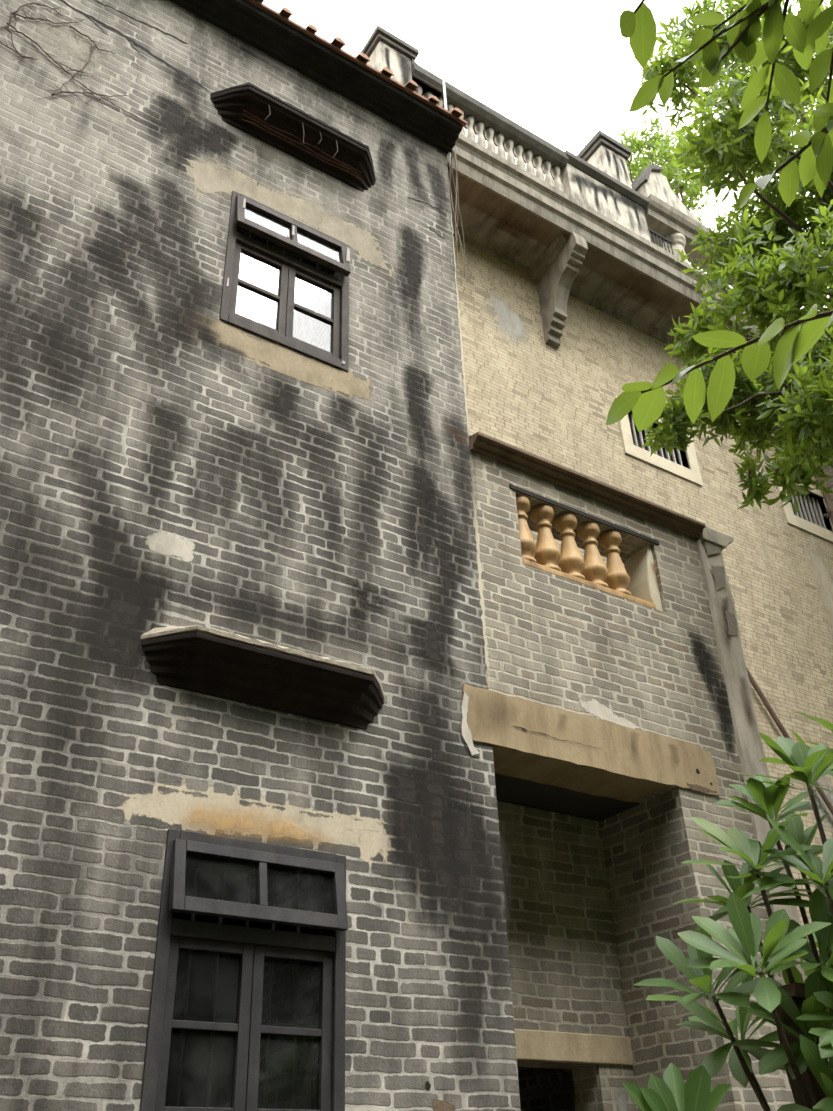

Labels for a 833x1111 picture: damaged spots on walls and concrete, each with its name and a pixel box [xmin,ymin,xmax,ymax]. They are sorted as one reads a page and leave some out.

spalling [461,692,480,755]
crack [514,726,604,750]